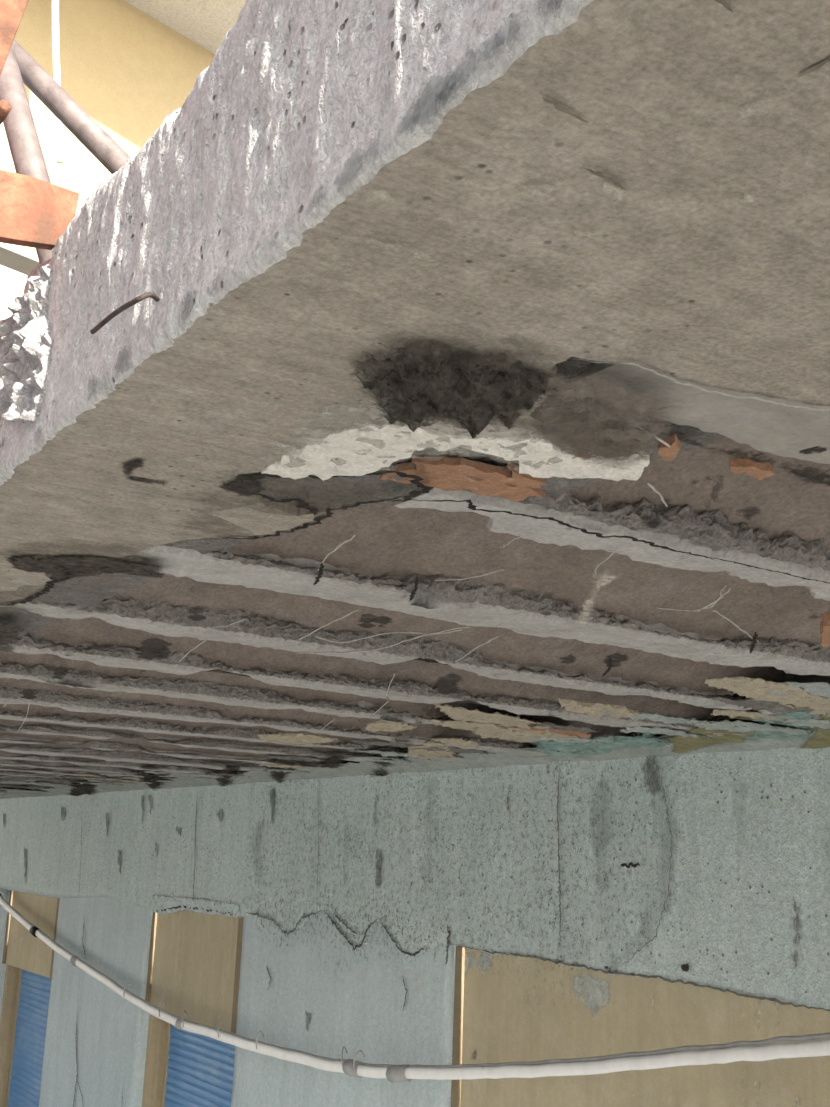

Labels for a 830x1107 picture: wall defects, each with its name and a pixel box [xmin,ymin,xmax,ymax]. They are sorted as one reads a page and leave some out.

spalling [0,266,54,443]
spalling [90,292,160,334]
spalling [254,397,681,507]
water stain [350,341,830,486]
spalling [729,457,775,480]
spalling [7,555,164,580]
crack [409,576,419,602]
crack [212,471,829,585]
flaking render [257,732,338,745]
flaking render [364,720,418,733]
flaking render [433,677,830,795]
crack [247,757,830,1011]